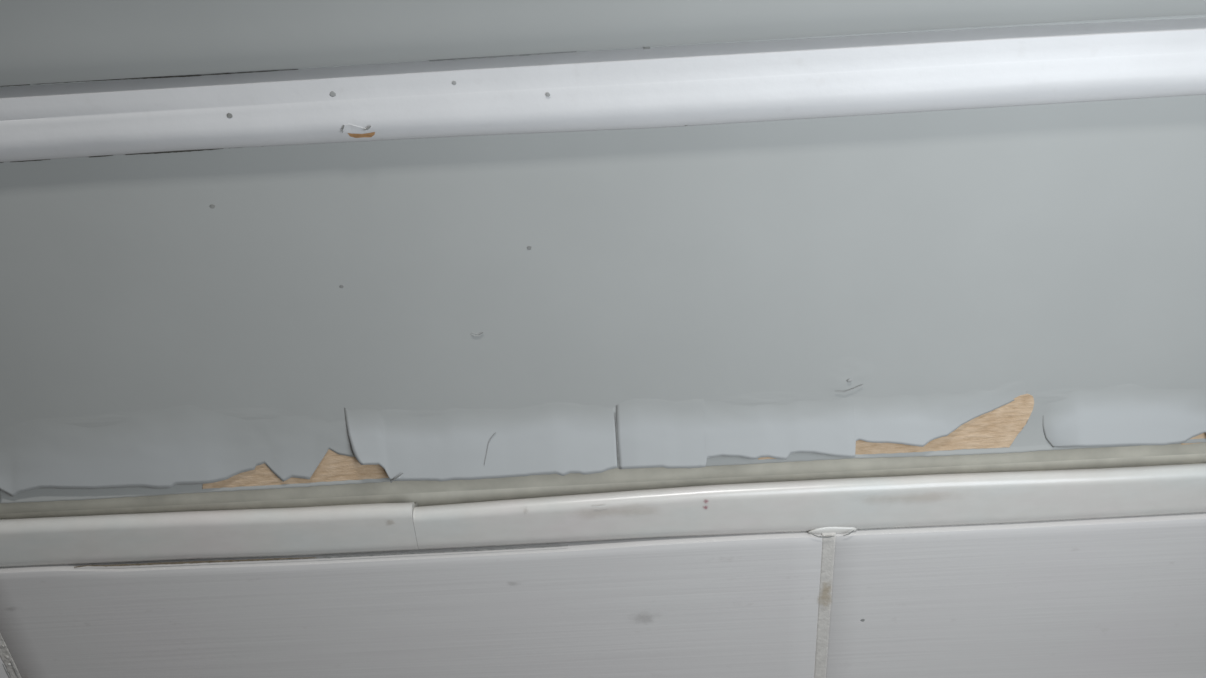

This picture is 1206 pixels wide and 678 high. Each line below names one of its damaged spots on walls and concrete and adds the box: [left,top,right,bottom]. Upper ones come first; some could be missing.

peeling [0,381,1206,497]